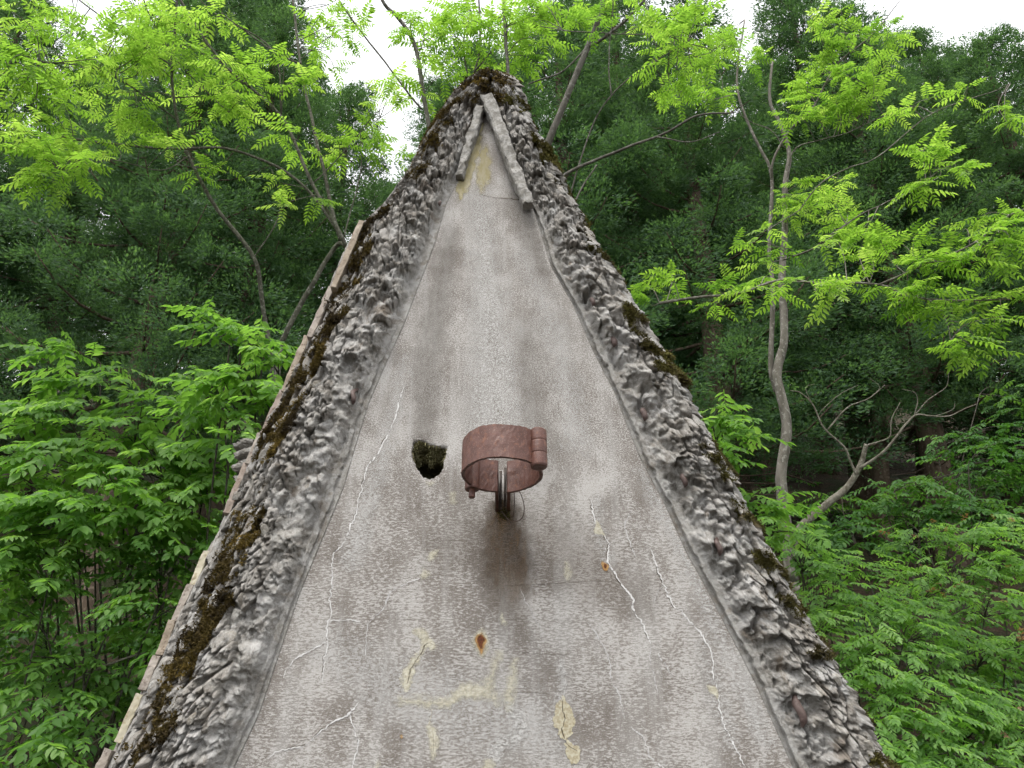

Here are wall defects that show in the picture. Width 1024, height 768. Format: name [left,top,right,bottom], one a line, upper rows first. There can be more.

water stain [456,123,519,429]
spalling [405,434,452,486]
crack [283,387,422,680]
water stain [485,500,528,596]
peeling [402,628,436,692]
corrosion [474,629,488,657]
crack [587,500,745,768]
peeling [553,695,581,765]